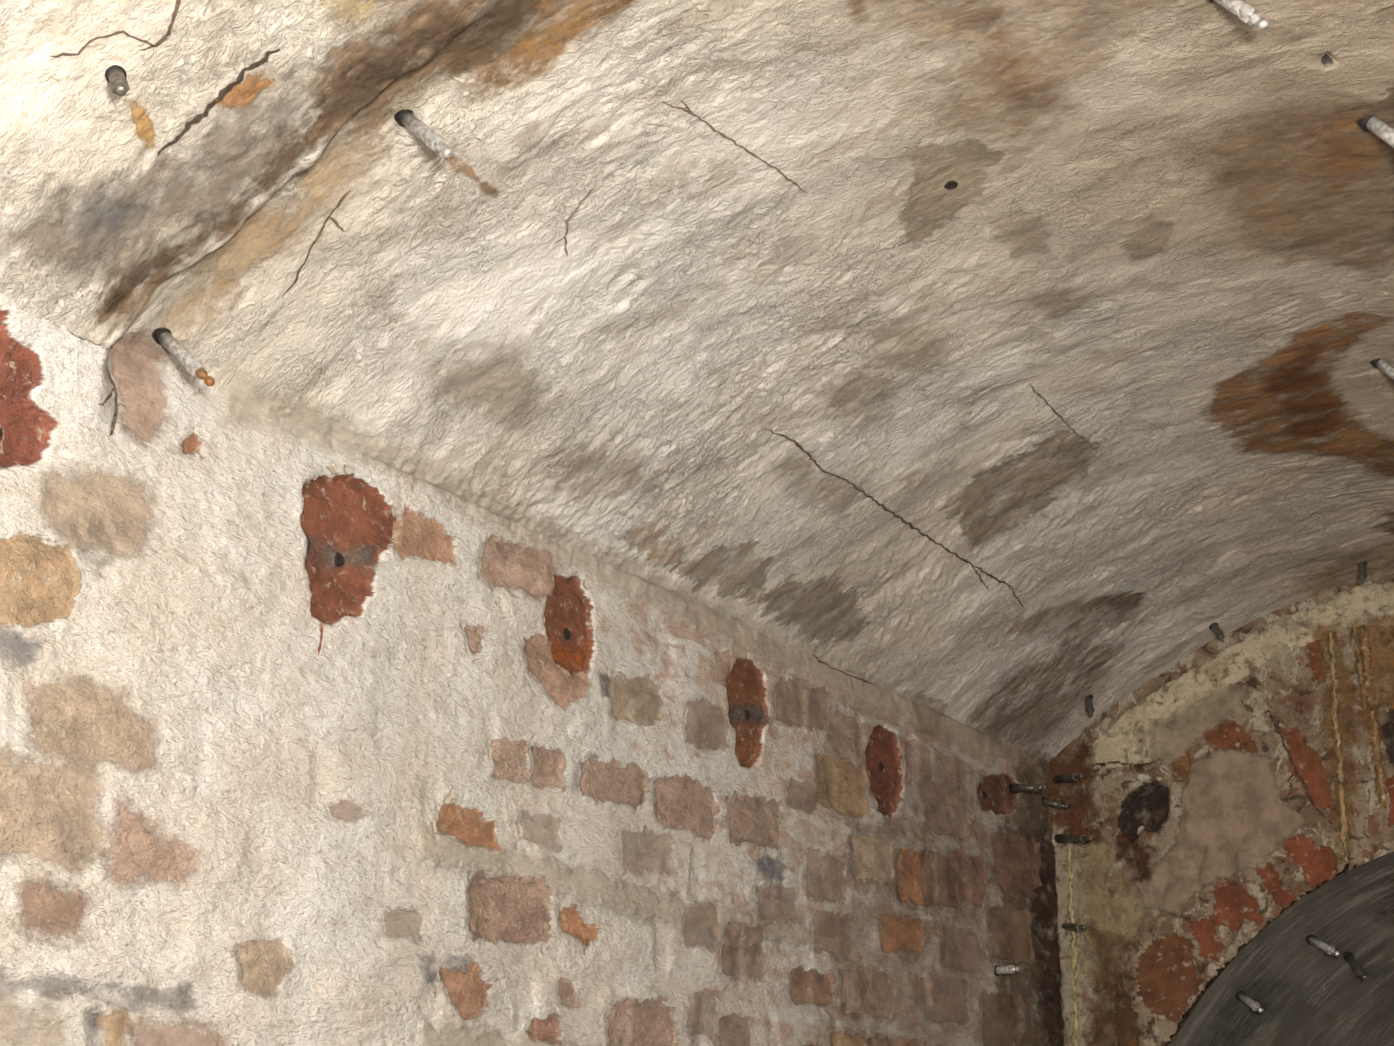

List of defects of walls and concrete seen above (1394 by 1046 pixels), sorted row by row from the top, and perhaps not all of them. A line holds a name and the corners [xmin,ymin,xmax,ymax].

crack [50,0,181,58]
crack [157,49,280,157]
water stain [13,0,631,329]
crack [662,100,808,193]
water stain [1341,87,1394,128]
spalling [0,310,58,468]
corrosion [1203,313,1394,476]
spalling [301,464,456,654]
spalling [476,534,594,711]
crack [764,429,1025,608]
corrosion [1313,626,1356,862]
peeling [491,720,1042,1007]